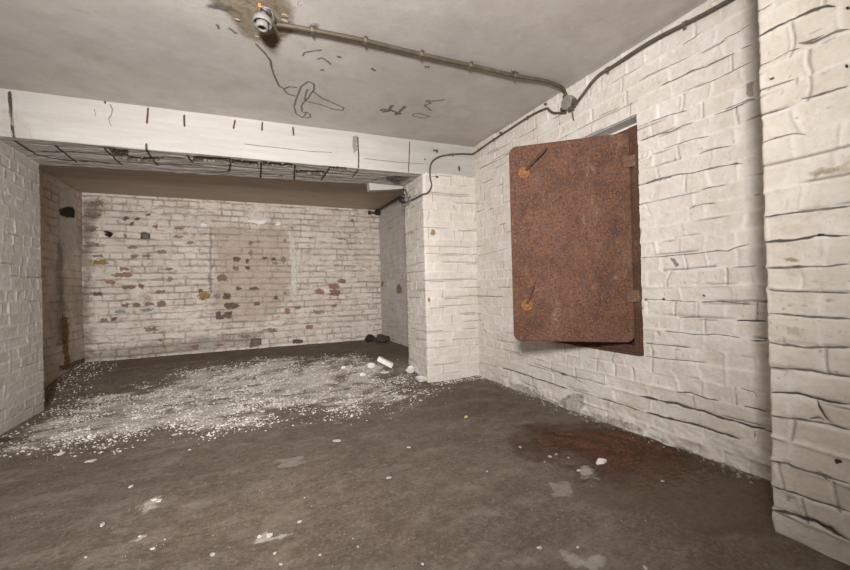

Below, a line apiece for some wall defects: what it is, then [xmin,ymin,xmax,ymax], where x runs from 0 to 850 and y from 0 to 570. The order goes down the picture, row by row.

crack [256,44,284,89]
crack [145,108,422,181]
spalling [59,206,75,218]
peeling [86,200,113,237]
spalling [123,214,167,259]
peeling [233,240,260,271]
peeling [100,267,173,323]
peeling [197,286,260,319]
peeling [284,279,346,314]
rust [62,317,71,366]
spalling [239,328,277,348]
rust [517,425,707,483]